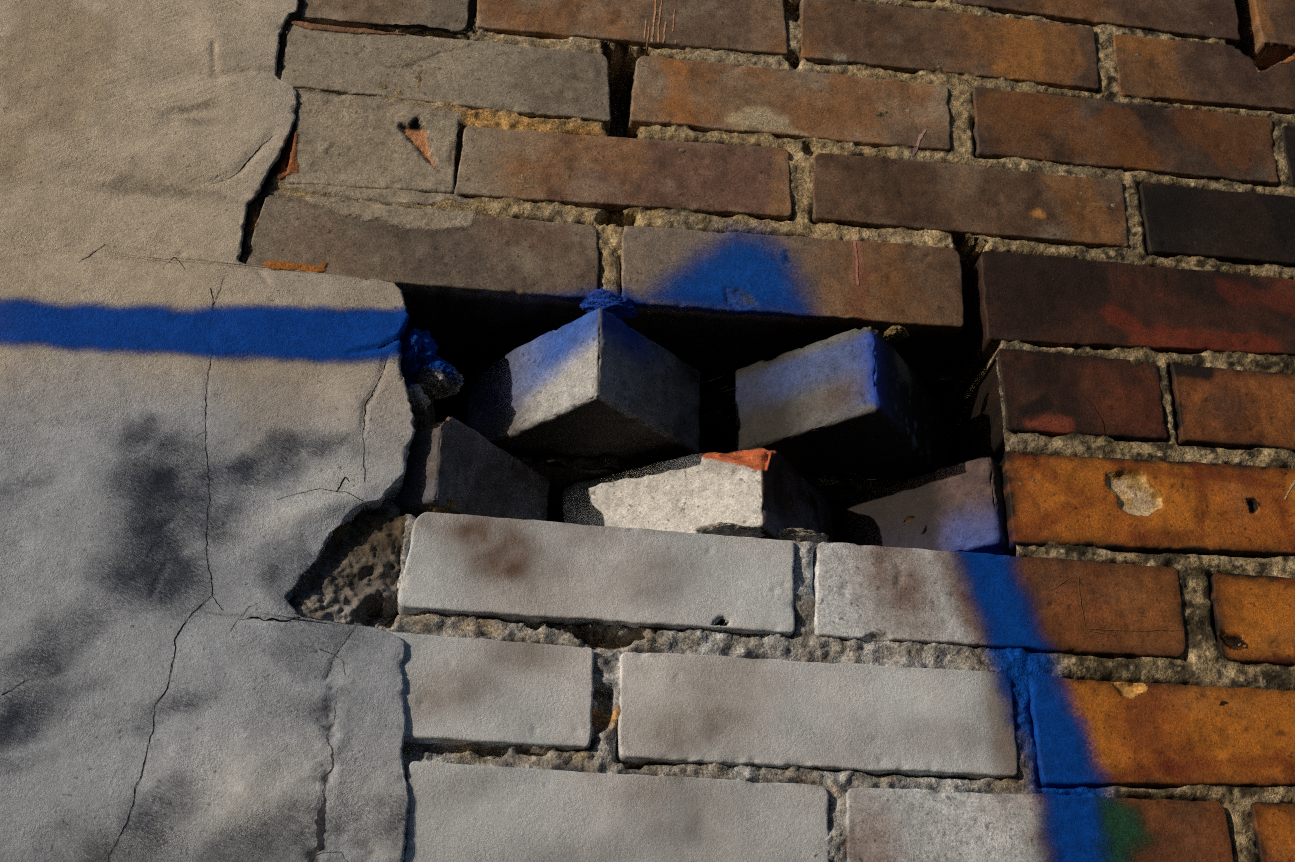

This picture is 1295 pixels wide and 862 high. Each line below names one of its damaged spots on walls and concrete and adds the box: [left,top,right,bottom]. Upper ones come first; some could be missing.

crack [210,0,476,309]
crack [108,357,300,862]
crack [277,339,398,501]
spalling [288,499,407,628]
spalling [1106,469,1163,516]
crack [309,626,356,862]